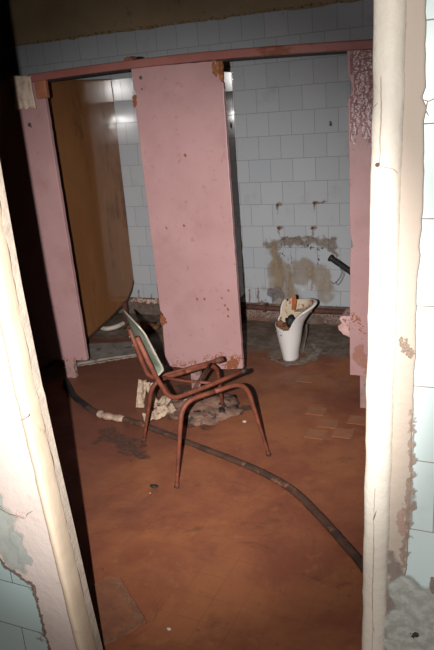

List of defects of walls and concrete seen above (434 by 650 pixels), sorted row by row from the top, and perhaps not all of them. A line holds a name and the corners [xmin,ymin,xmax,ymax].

water stain [265,236,338,303]
corrosion [169,352,243,373]
spalling [399,336,415,359]
peeling [396,410,417,567]
peeling [0,497,51,650]